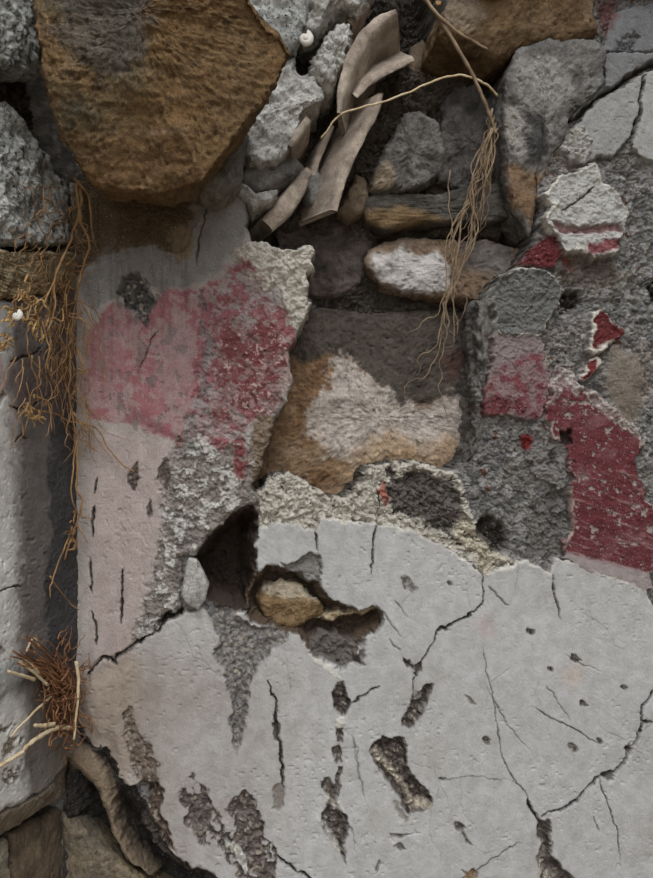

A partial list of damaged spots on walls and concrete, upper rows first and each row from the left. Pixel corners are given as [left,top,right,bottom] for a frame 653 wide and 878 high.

crack [568,51,653,140]
peeling [481,267,653,575]
spalling [194,460,513,752]
crack [403,571,485,695]
crack [552,574,562,620]
spalling [122,706,176,852]
spalling [179,773,278,878]
crack [267,680,285,789]
crack [276,852,311,878]
spalling [369,683,435,815]
crack [439,646,653,866]
spalling [535,814,573,878]